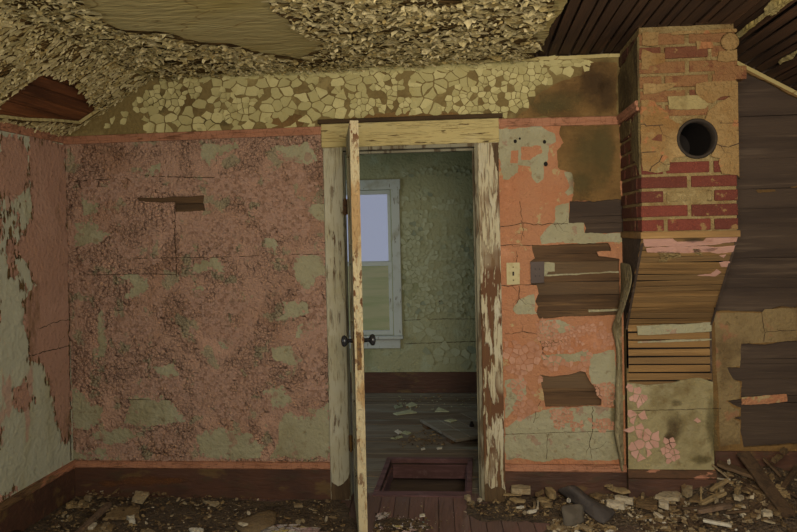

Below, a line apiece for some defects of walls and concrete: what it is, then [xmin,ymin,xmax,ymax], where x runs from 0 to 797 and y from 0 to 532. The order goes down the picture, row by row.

peeling [0,0,622,462]
peeling [503,294,680,464]
flaking render [714,308,797,447]